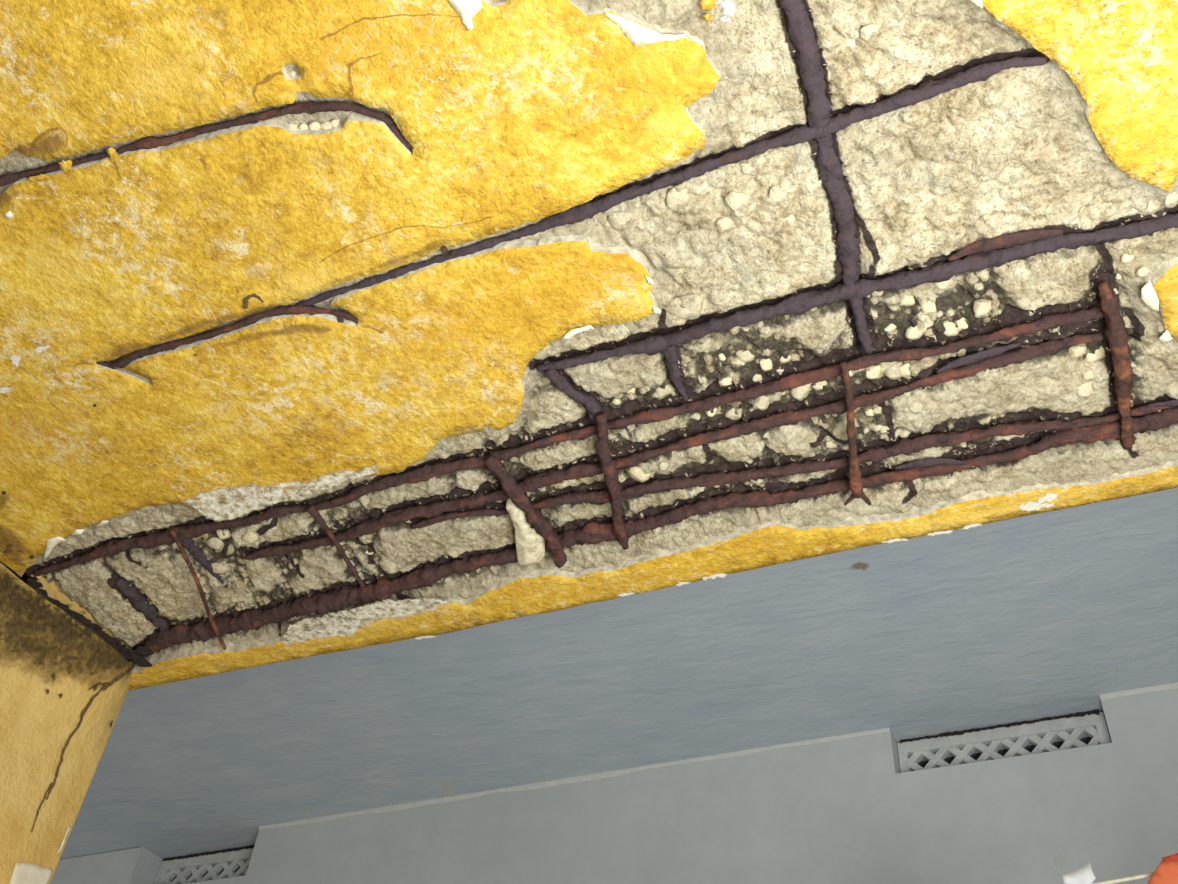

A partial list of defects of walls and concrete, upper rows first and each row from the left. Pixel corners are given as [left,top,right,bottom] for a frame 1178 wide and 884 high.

rust [583,0,809,204]
rust [802,0,1050,118]
spalling [0,0,1178,658]
rust [21,133,1178,658]
damp [0,528,22,559]
damp [0,569,134,699]
crack [24,578,162,832]